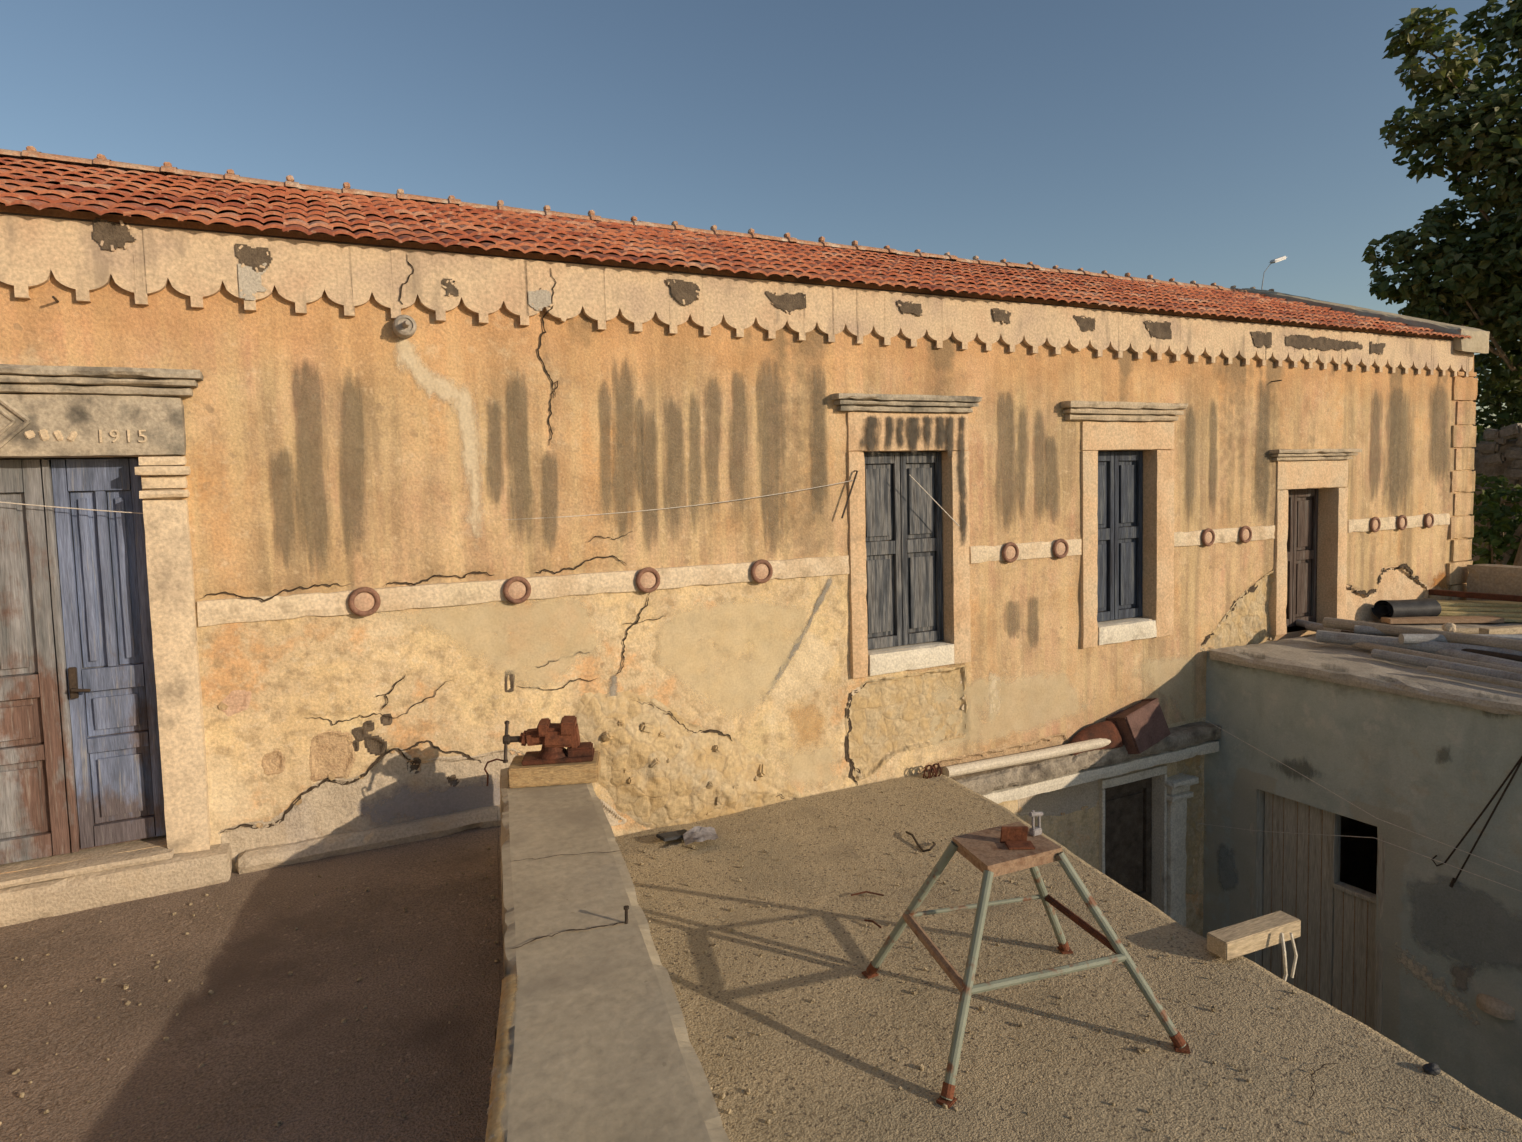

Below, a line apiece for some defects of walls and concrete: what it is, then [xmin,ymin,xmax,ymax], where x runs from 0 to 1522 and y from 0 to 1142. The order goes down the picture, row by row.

crack [537,268,558,445]
spalling [766,291,806,315]
water stain [397,338,557,543]
water stain [600,364,780,540]
water stain [999,395,1058,518]
water stain [1187,405,1217,507]
crack [535,531,633,574]
crack [522,593,732,741]
spalling [1200,569,1276,652]
spalling [1345,566,1429,623]
crack [220,674,481,833]
spalling [218,713,525,863]